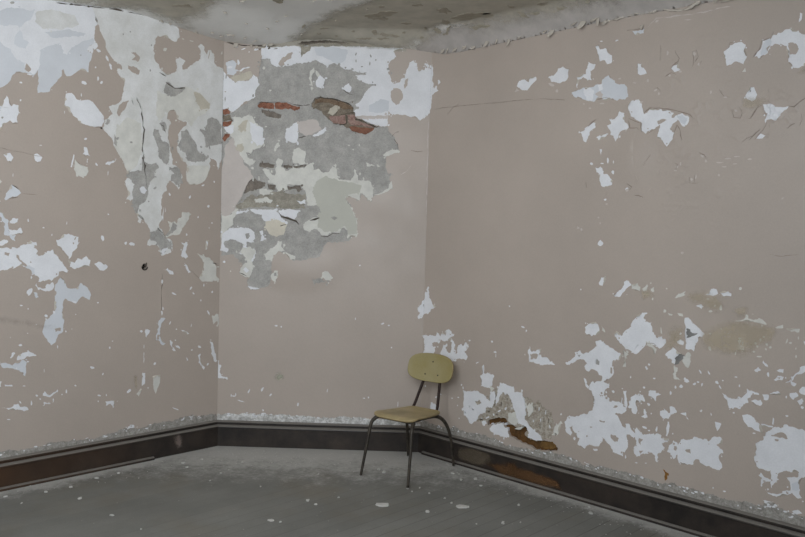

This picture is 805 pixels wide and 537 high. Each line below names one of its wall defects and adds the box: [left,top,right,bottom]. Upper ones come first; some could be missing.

peeling [420,7,493,39]
peeling [723,13,805,72]
peeling [515,77,537,92]
peeling [548,41,692,187]
peeling [733,87,805,142]
spalling [0,0,440,293]
peeling [0,213,108,349]
peeling [418,287,436,319]
peeling [697,287,742,312]
peeling [0,309,805,527]